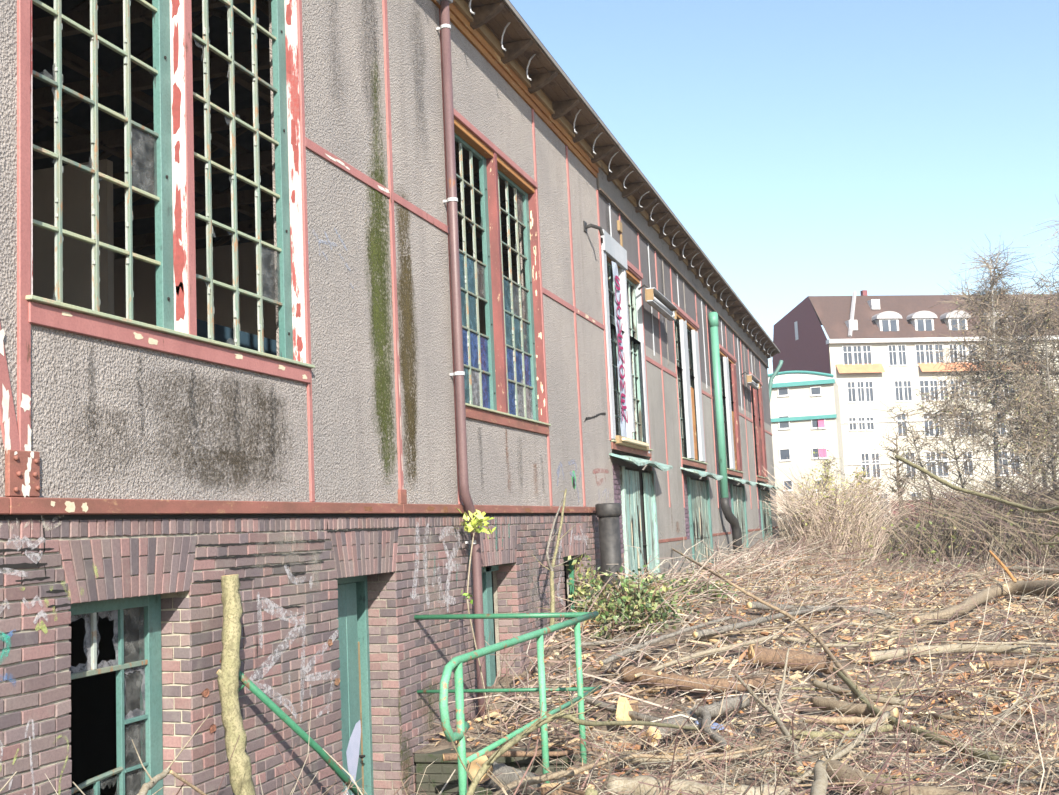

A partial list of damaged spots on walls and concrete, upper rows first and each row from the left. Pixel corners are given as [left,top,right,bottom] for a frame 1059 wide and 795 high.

peeling [171,0,181,163]
peeling [291,119,299,174]
peeling [174,184,185,321]
leakage [364,0,417,481]
peeling [2,383,34,497]
peeling [51,501,88,513]